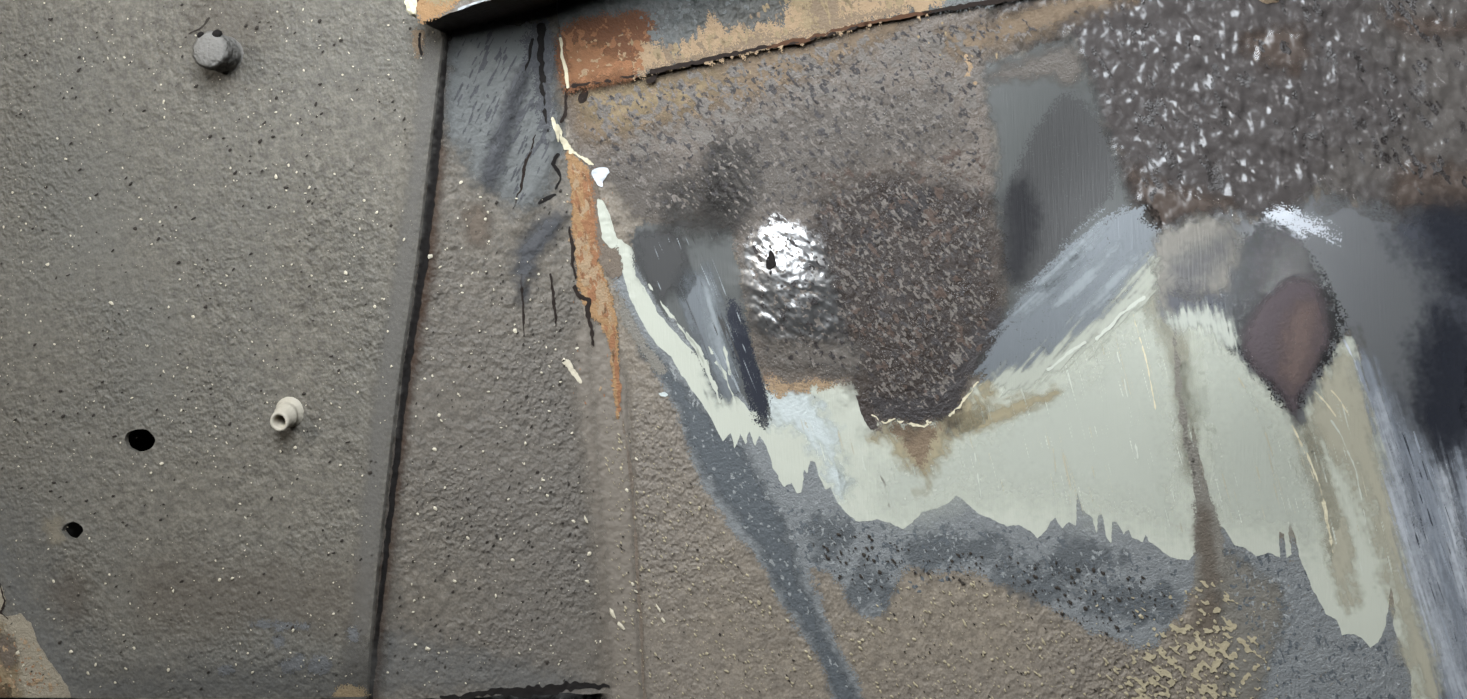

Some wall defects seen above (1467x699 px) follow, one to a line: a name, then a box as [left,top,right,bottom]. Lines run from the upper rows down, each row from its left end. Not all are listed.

spalling [208,118,326,209]
leakage [481,15,560,188]
leakage [514,213,562,300]
corrosion [552,0,1138,699]
corrosion [1183,427,1227,630]